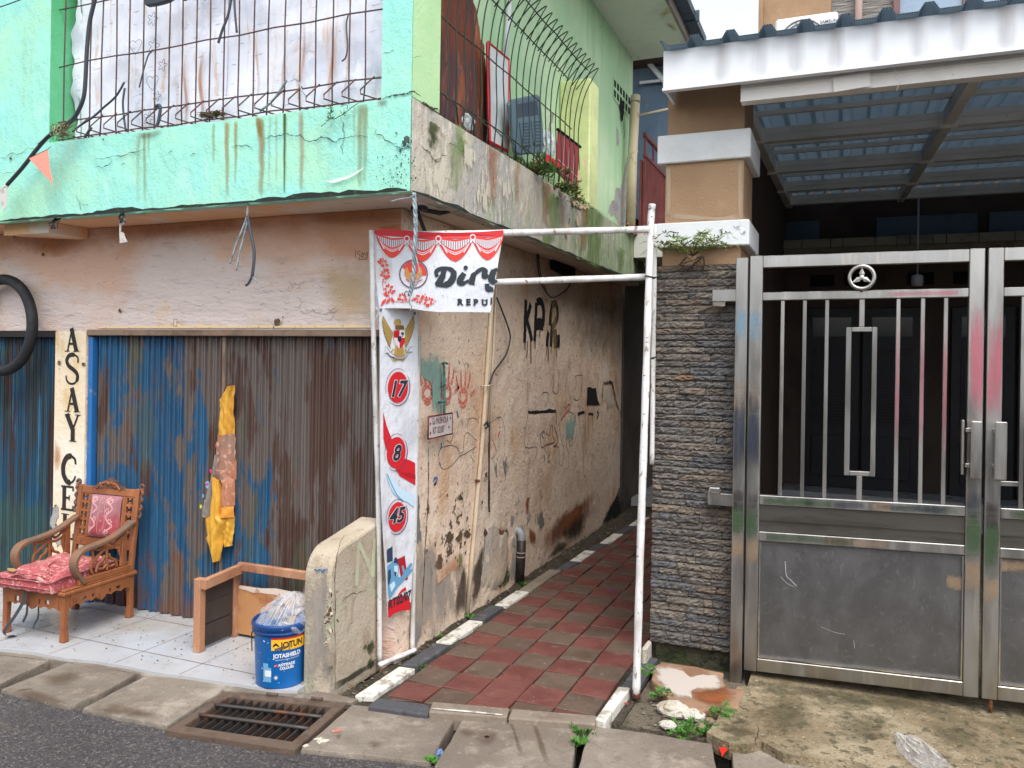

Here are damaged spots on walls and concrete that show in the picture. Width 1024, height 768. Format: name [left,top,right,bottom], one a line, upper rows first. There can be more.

corrosion [225,123,237,164]
corrosion [256,118,264,165]
crack [232,123,396,153]
damp [452,126,466,167]
damp [525,193,631,275]
spalling [417,483,471,574]
spalling [322,588,339,650]